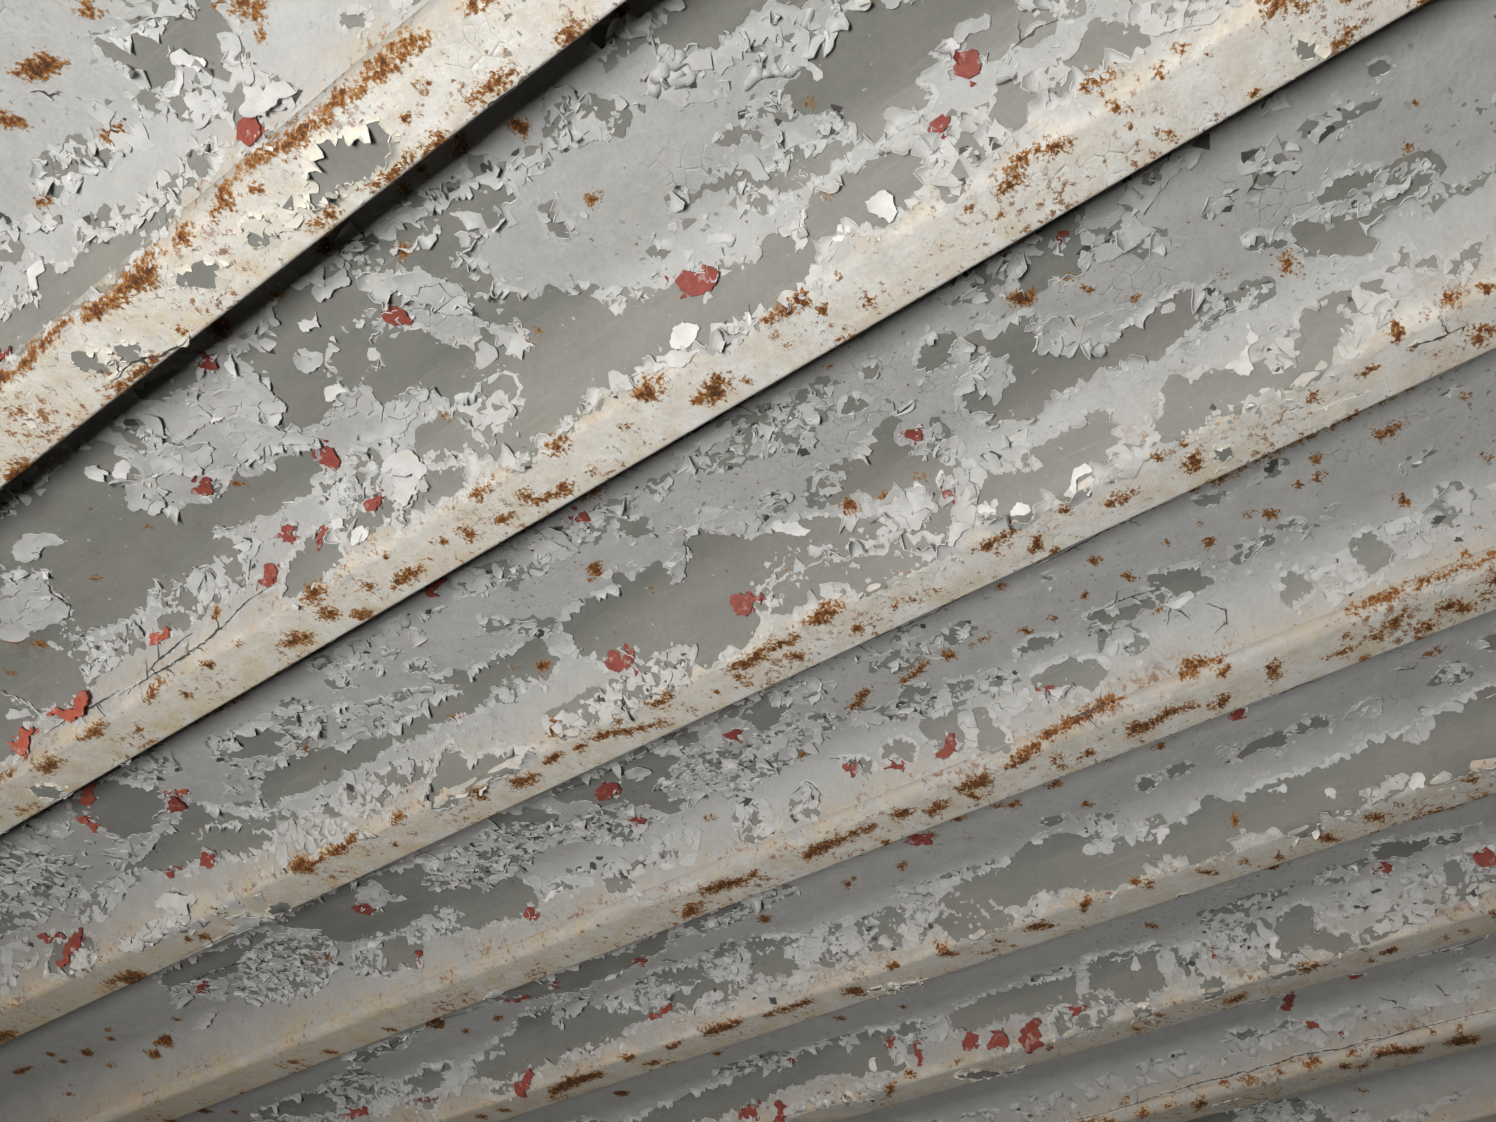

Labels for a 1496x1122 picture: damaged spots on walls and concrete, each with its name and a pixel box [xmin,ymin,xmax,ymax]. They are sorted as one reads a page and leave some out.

rust [210,0,268,43]
peeling [331,0,421,40]
rust [458,63,530,109]
peeling [1200,33,1396,222]
rust [2,460,37,483]
rust [1391,490,1411,508]
peeling [0,133,1496,1030]
peeling [249,629,1496,1122]